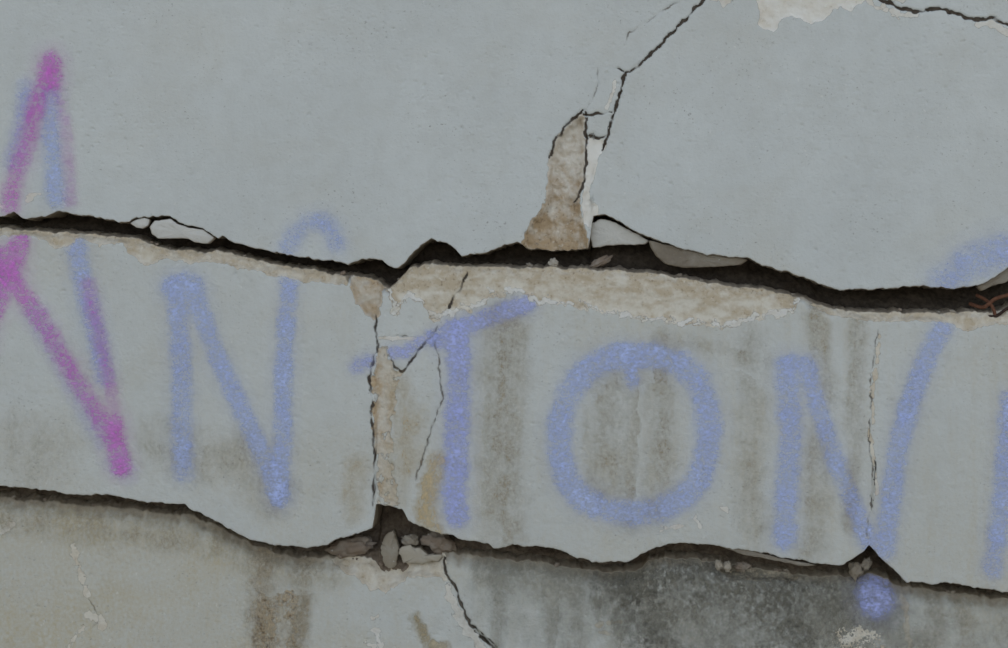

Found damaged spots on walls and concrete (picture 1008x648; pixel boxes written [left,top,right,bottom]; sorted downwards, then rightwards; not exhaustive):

flaking render [756,0,865,32]
crack [866,0,1008,37]
crack [548,0,731,203]
flaking render [0,114,800,330]
crack [0,214,1008,310]
flaking render [975,268,1008,291]
flaking render [811,303,1008,332]
crack [0,486,187,511]
crack [279,316,902,648]
flaking render [332,552,447,594]
water stain [597,560,868,648]
crack [939,582,996,594]